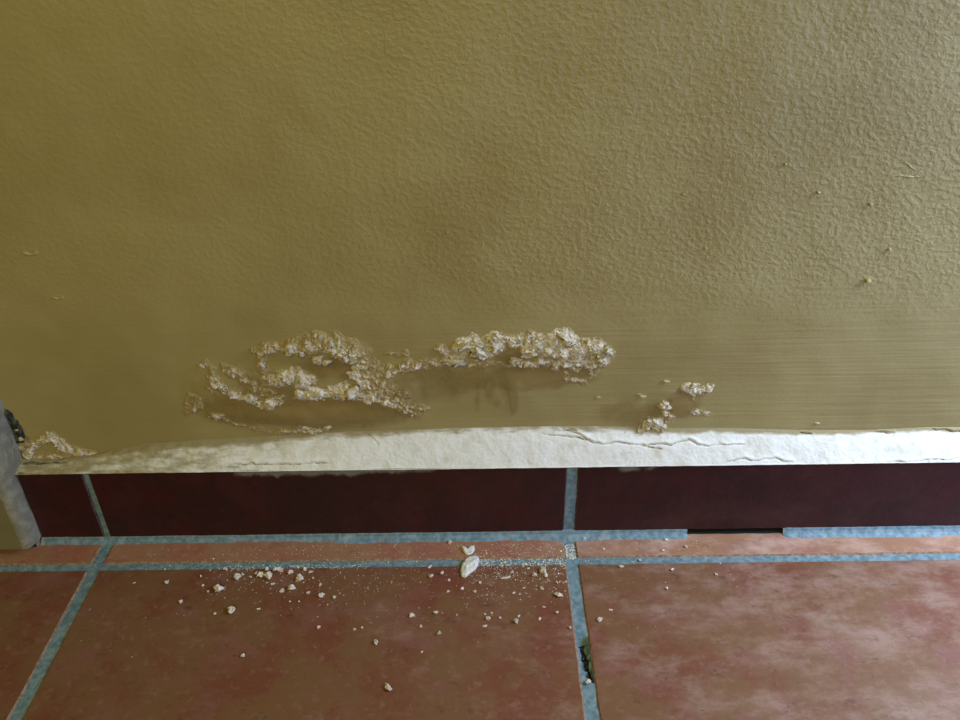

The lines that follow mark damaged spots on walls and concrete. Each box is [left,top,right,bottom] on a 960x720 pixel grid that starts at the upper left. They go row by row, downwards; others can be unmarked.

flaking render [179,327,616,436]
flaking render [624,381,714,434]
flaking render [4,410,97,465]